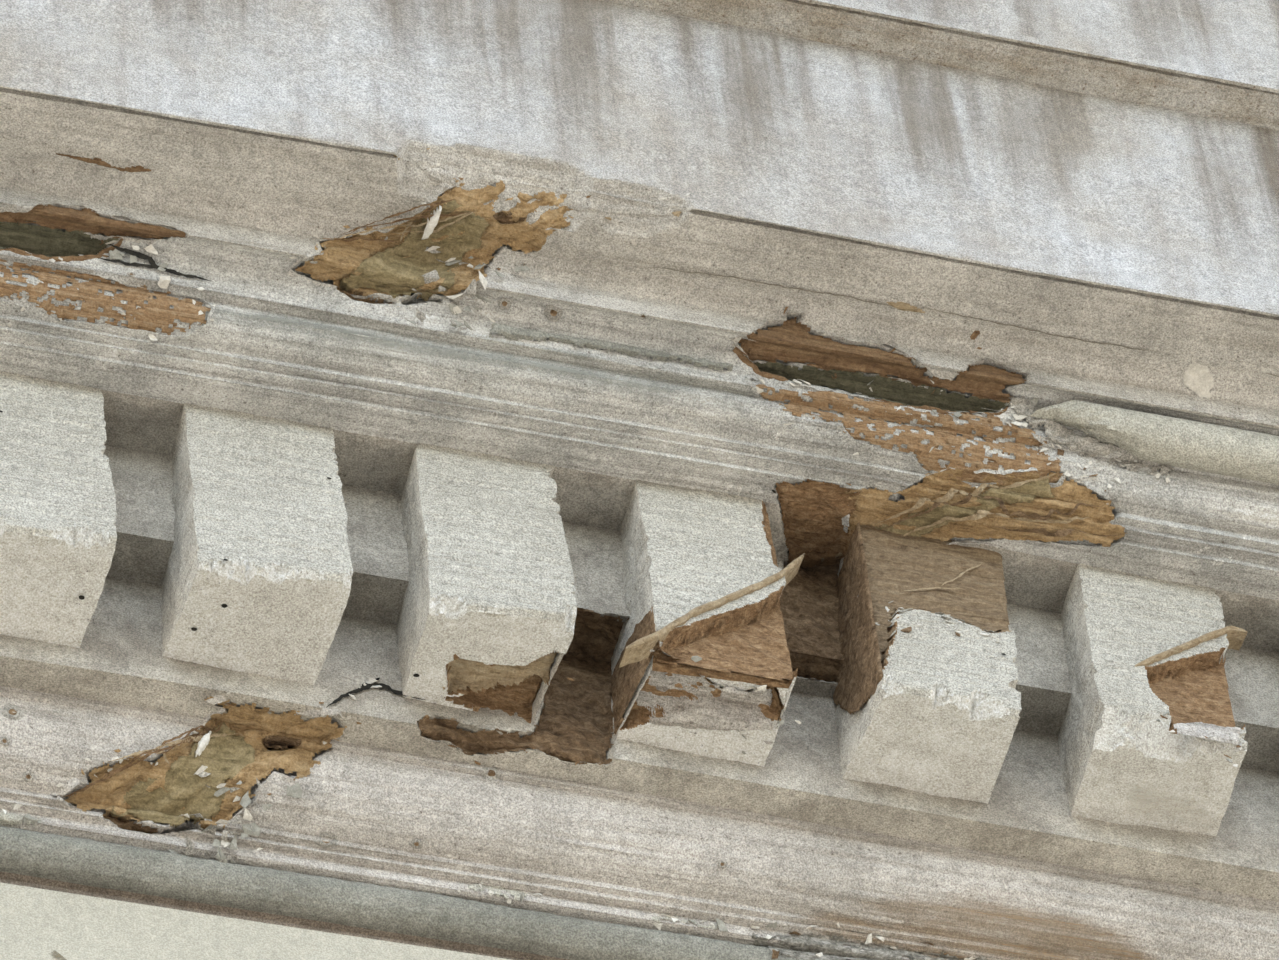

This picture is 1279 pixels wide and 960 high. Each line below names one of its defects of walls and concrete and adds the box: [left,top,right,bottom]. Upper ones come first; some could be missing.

peeling [0,203,218,341]
spalling [287,140,695,331]
spalling [417,307,1175,765]
spalling [50,691,361,864]
crack [326,677,425,708]
spalling [1135,626,1248,768]